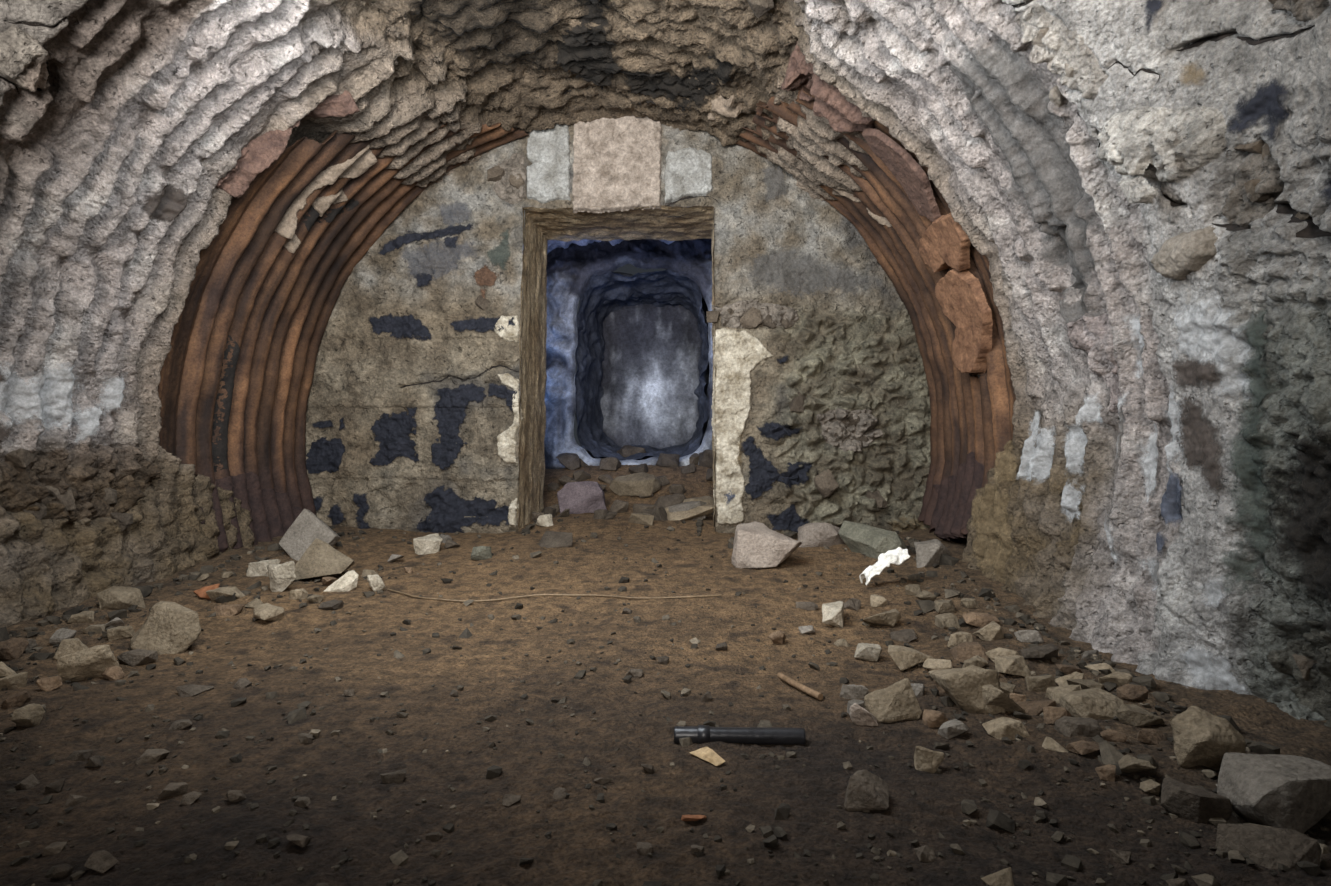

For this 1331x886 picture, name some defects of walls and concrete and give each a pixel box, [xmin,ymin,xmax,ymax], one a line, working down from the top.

crack [1108,25,1315,85]
rust [216,90,360,198]
rust [919,212,993,373]
peeling [488,373,522,464]
peeling [508,498,519,526]
peeling [706,299,799,525]
leakage [1017,397,1102,519]